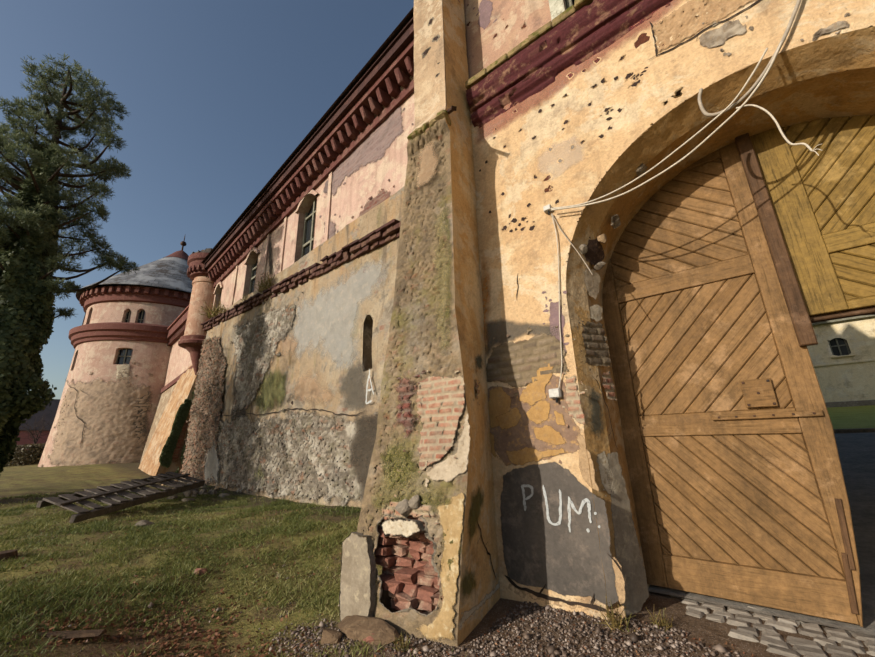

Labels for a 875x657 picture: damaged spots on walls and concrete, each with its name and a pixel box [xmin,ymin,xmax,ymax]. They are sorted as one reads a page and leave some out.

peeling [458,0,509,40]
spalling [699,16,754,56]
peeling [323,107,413,196]
peeling [394,237,617,496]
crack [65,379,88,447]
spalling [339,495,441,622]
crack [477,521,619,616]